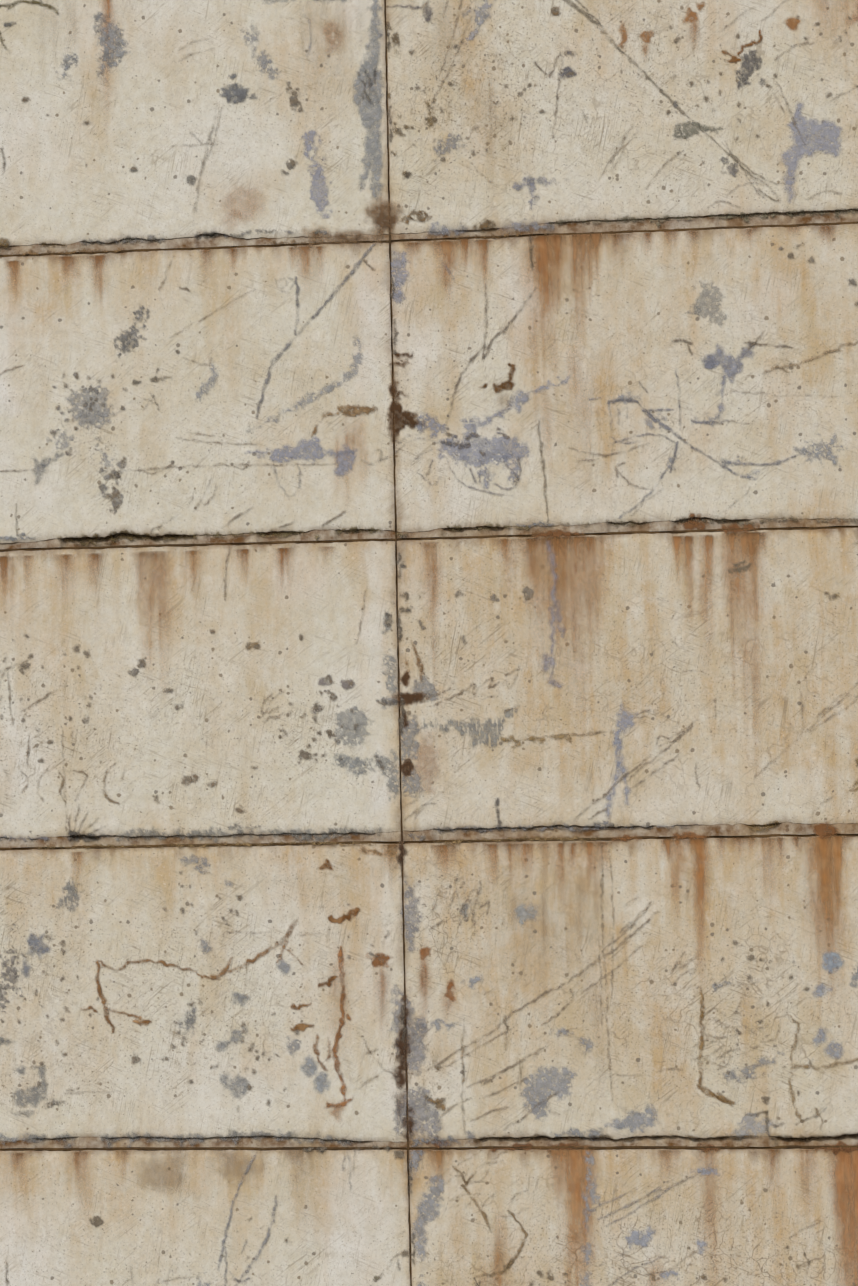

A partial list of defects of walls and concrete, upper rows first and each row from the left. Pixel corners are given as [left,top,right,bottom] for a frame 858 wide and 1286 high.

peeling [354,0,443,196]
peeling [710,104,858,222]
peeling [35,369,165,475]
peeling [417,381,566,487]
corrosion [483,363,515,393]
corrosion [673,513,764,599]
corrosion [291,1004,314,1031]
corrosion [328,908,360,924]
corrosion [420,947,430,987]
corrosion [662,823,842,933]
corrosion [549,1142,591,1286]
corrosion [801,1141,858,1286]